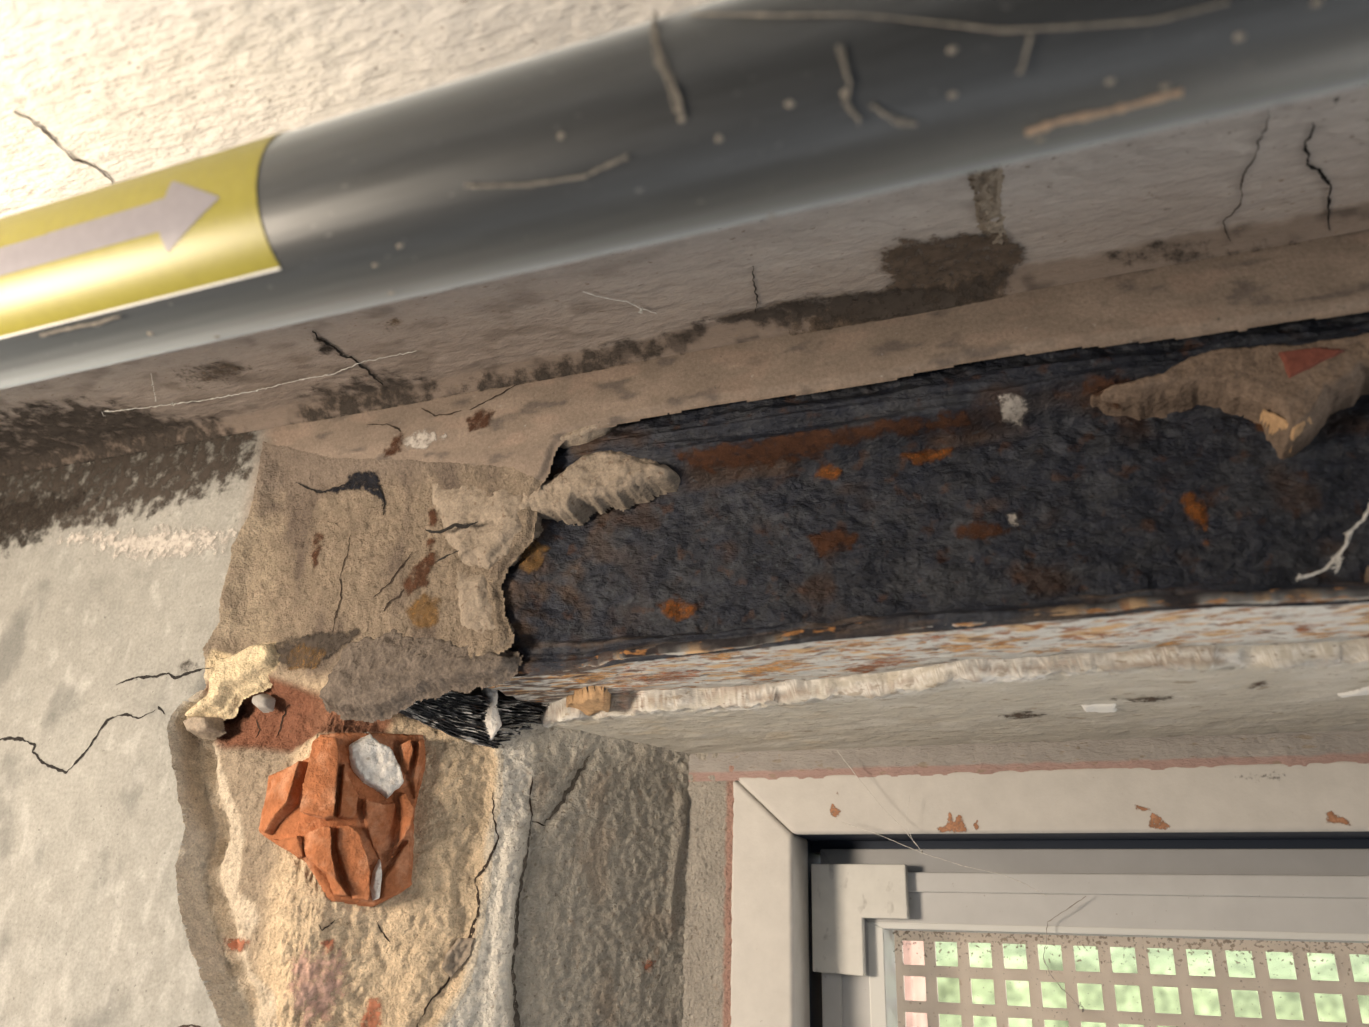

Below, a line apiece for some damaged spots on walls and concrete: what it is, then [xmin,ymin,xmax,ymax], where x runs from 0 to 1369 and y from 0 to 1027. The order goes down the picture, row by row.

crack [14,111,113,184]
damp [477,233,1027,391]
crack [312,331,384,386]
spalling [1278,347,1345,378]
damp [0,396,257,559]
rust [1181,493,1208,545]
rust [520,539,548,573]
rust [571,653,805,708]
rust [835,642,907,674]
crack [0,661,214,774]
spalling [167,441,544,1027]
crack [511,756,590,1027]